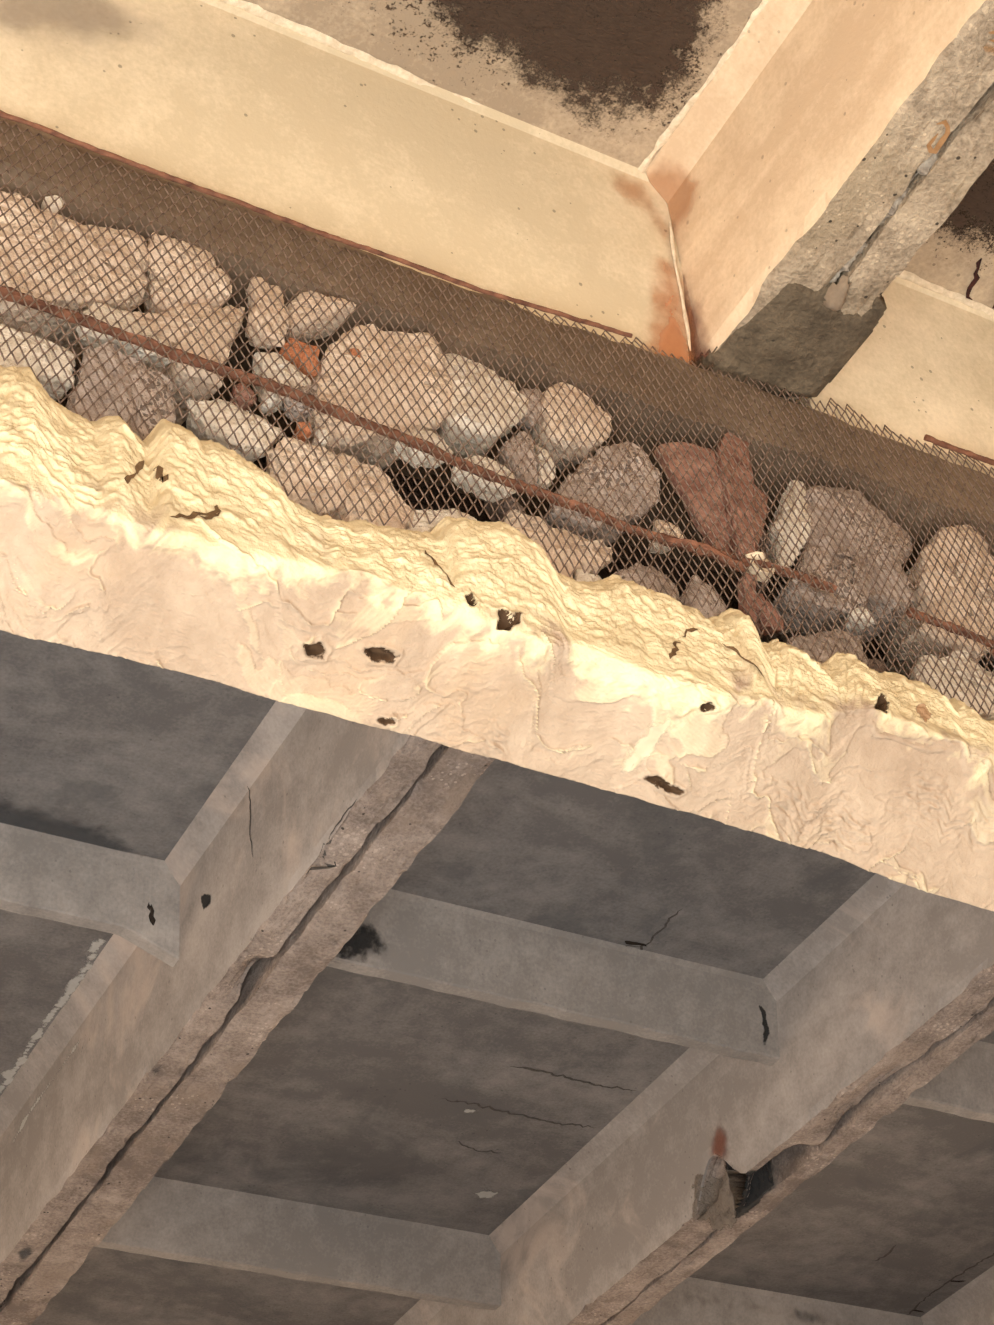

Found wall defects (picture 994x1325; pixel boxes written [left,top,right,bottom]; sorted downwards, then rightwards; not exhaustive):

damp [218,0,483,106]
rust [653,288,708,364]
spalling [279,337,320,380]
crack [147,903,156,925]
crack [625,909,682,950]
crack [511,1066,636,1091]
crack [443,1098,596,1153]
spalling [692,1161,774,1231]